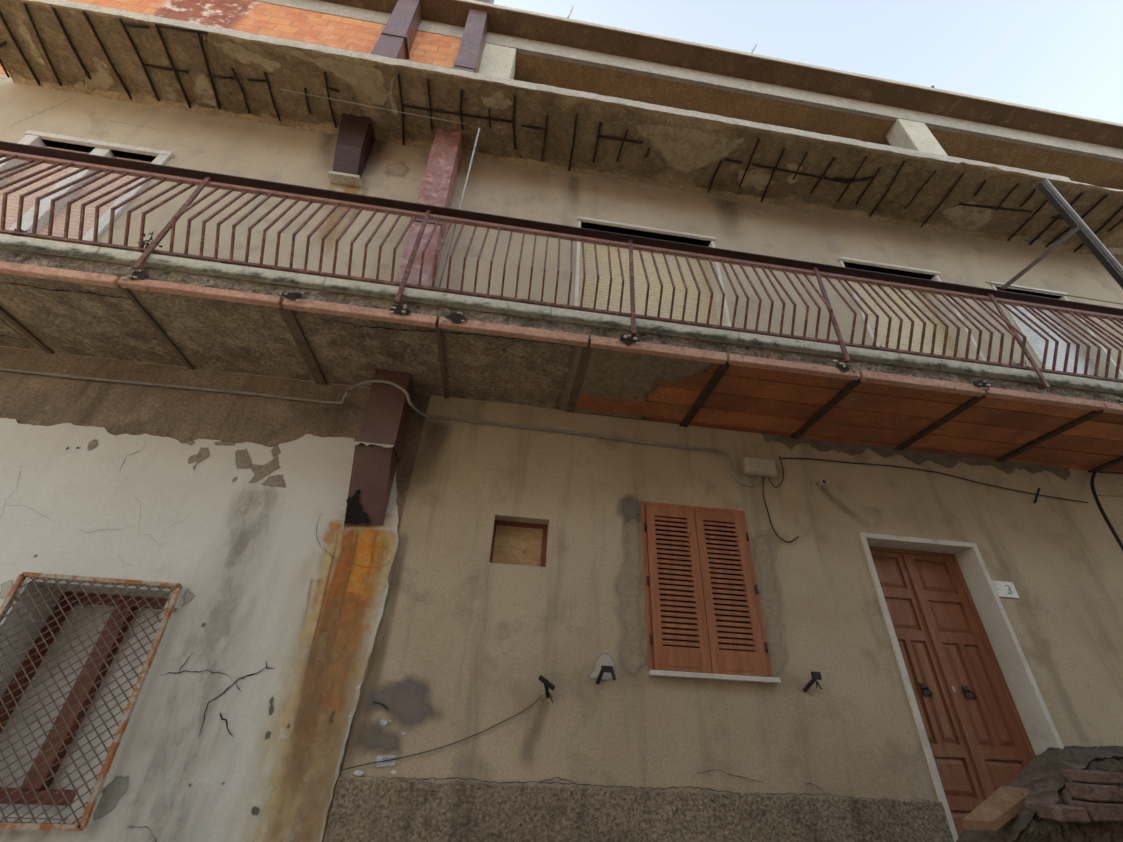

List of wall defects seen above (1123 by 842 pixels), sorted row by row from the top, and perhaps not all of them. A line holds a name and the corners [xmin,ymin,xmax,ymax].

spalling [0,0,1123,253]
spalling [121,269,149,280]
flaking render [185,440,285,487]
crack [161,656,276,738]
rust [266,522,396,842]